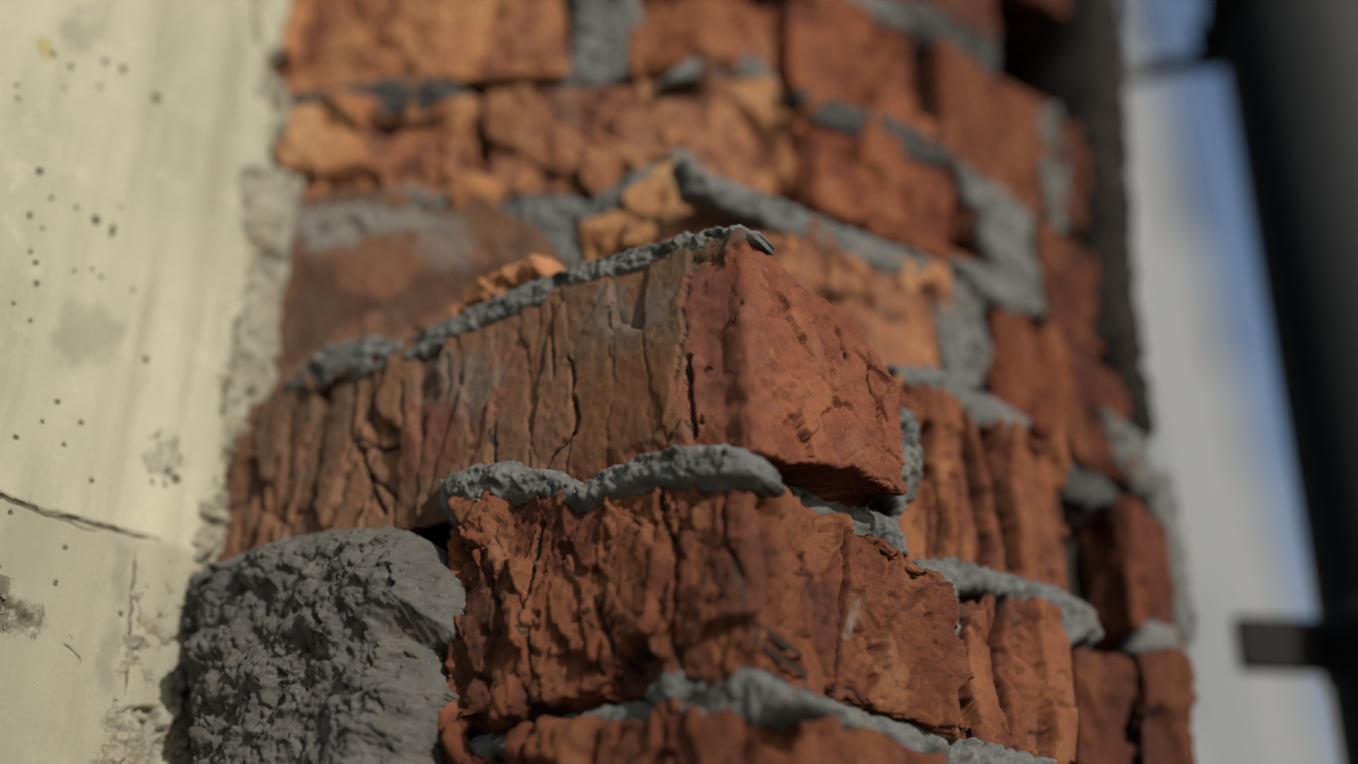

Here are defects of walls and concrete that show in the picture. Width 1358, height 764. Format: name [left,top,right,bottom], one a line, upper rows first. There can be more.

crack [255,388,330,533]
crack [360,394,405,511]
crack [487,418,498,463]
crack [551,305,580,461]
crack [669,366,698,441]
spalling [0,574,44,632]
crack [0,493,158,693]